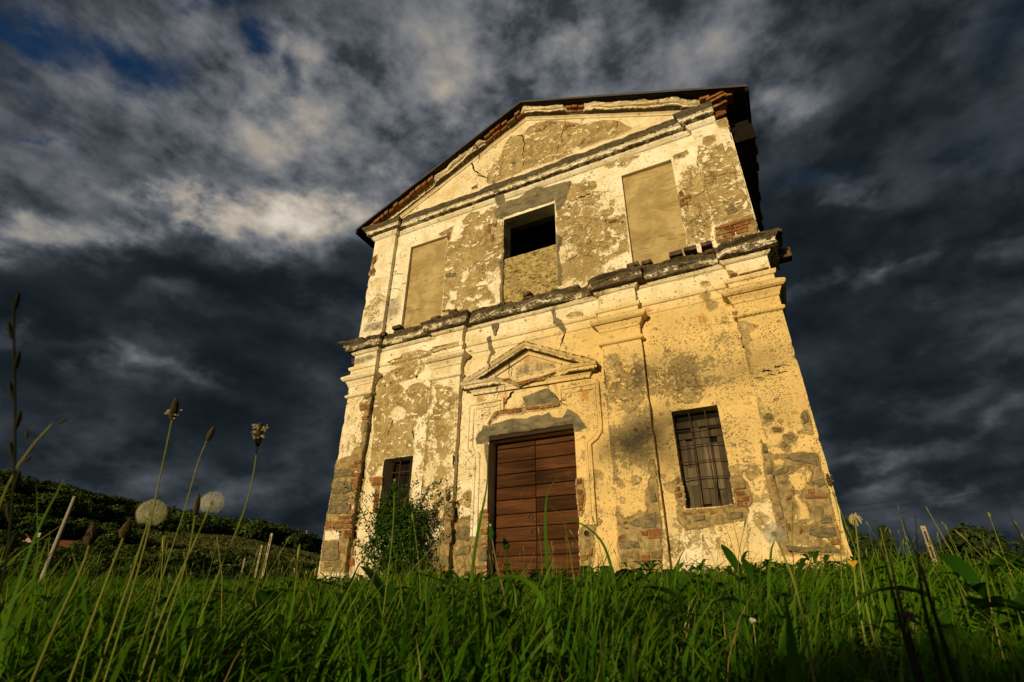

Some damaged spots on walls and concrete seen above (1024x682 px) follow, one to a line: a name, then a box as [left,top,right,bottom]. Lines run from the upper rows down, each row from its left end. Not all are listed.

flaking render [439,206,504,315]
flaking render [471,120,632,190]
flaking render [555,155,640,265]
flaking render [672,118,757,245]
flaking render [320,341,458,574]
flaking render [575,409,847,574]